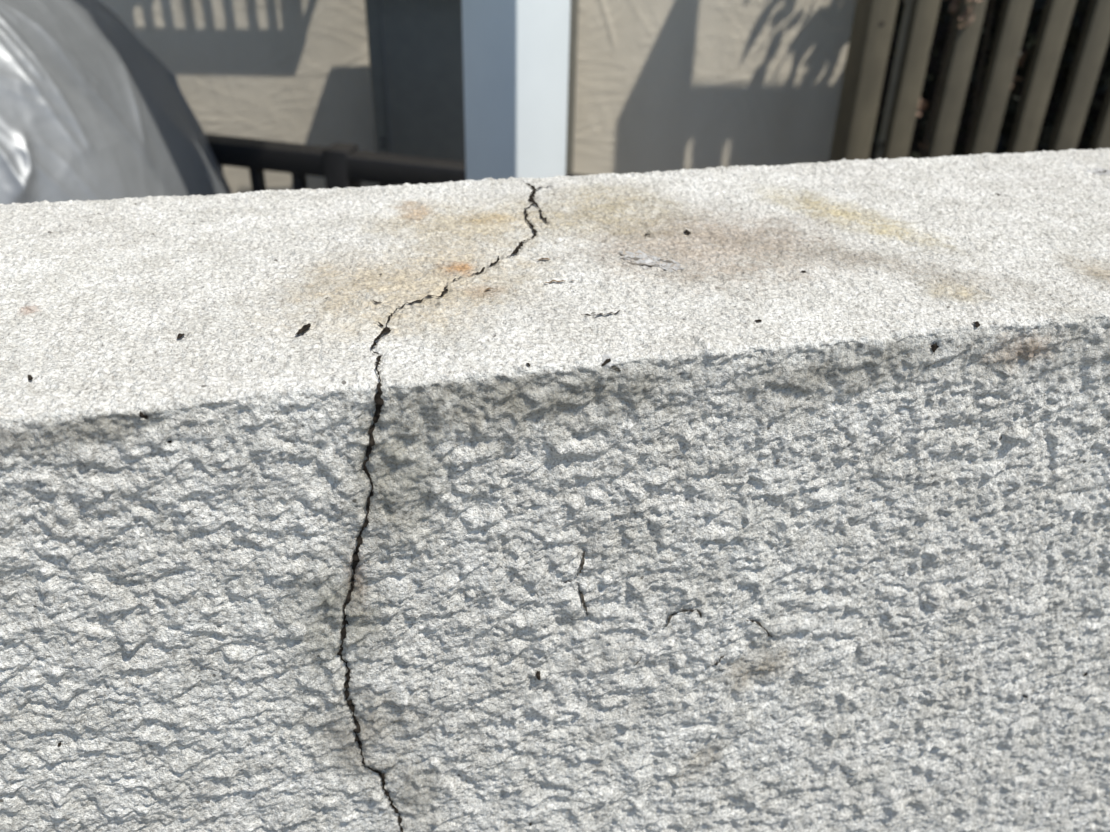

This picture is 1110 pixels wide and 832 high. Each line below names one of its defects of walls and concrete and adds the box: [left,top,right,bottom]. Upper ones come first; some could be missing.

crack [337,181,581,832]
crack [564,551,588,620]